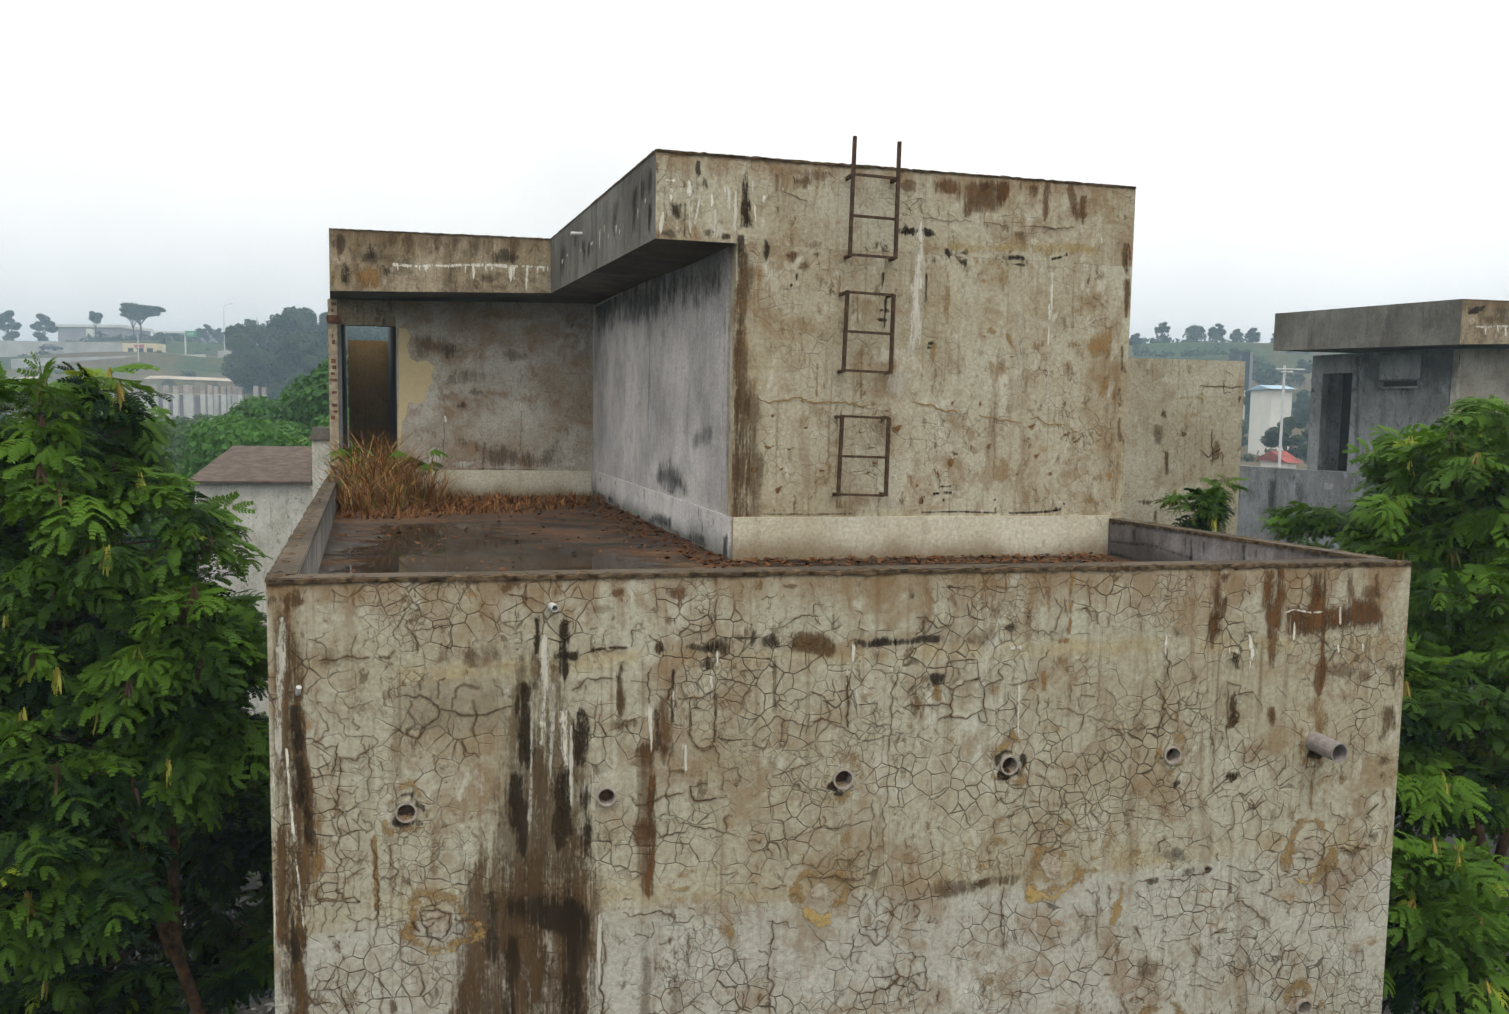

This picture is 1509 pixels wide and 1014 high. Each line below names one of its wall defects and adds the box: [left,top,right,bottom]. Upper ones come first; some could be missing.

leakage [341,161,852,517]
leakage [268,590,322,1014]
crack [292,593,512,1014]
leakage [449,616,688,1014]
leakage [689,637,730,742]
leakage [751,631,940,709]
leakage [930,673,945,686]
crack [489,570,1387,1014]
corrosion [1208,573,1230,648]
corrosion [1262,568,1383,696]